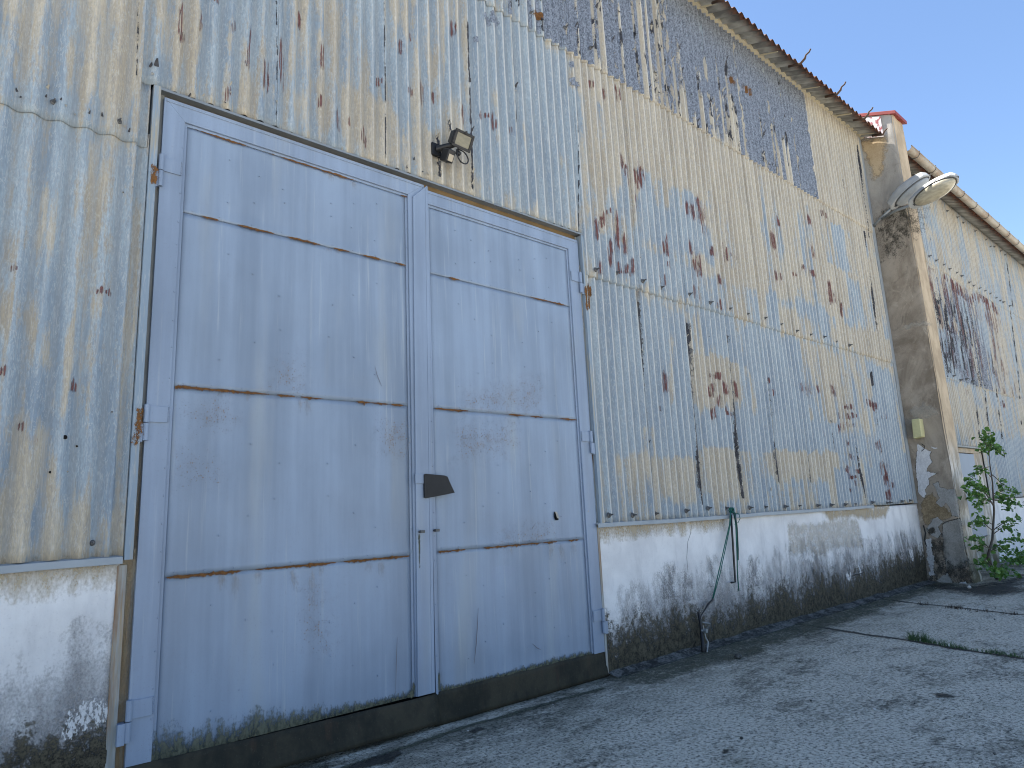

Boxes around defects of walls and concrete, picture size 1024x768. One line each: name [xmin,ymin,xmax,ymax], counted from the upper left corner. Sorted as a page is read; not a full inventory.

peeling [484,0,827,225]
leakage [875,206,925,263]
rust [131,408,144,446]
rust [175,360,321,435]
rust [435,376,544,461]
rust [167,570,240,579]
rust [256,535,420,570]
leakage [599,519,723,536]
leakage [605,528,1024,684]
flaking render [915,444,969,584]
leakage [0,663,108,768]